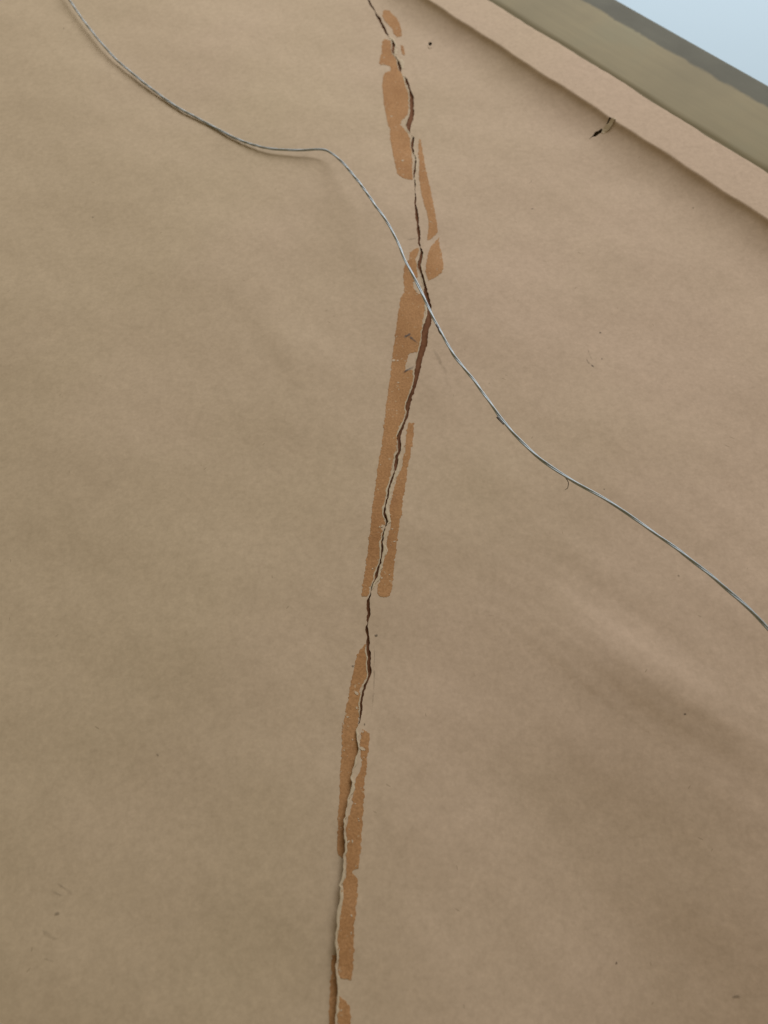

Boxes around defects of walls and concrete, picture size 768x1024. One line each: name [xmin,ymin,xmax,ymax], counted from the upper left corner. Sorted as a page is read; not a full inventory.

crack [335,1,432,1024]
peeling [361,10,443,597]
peeling [328,644,370,1024]